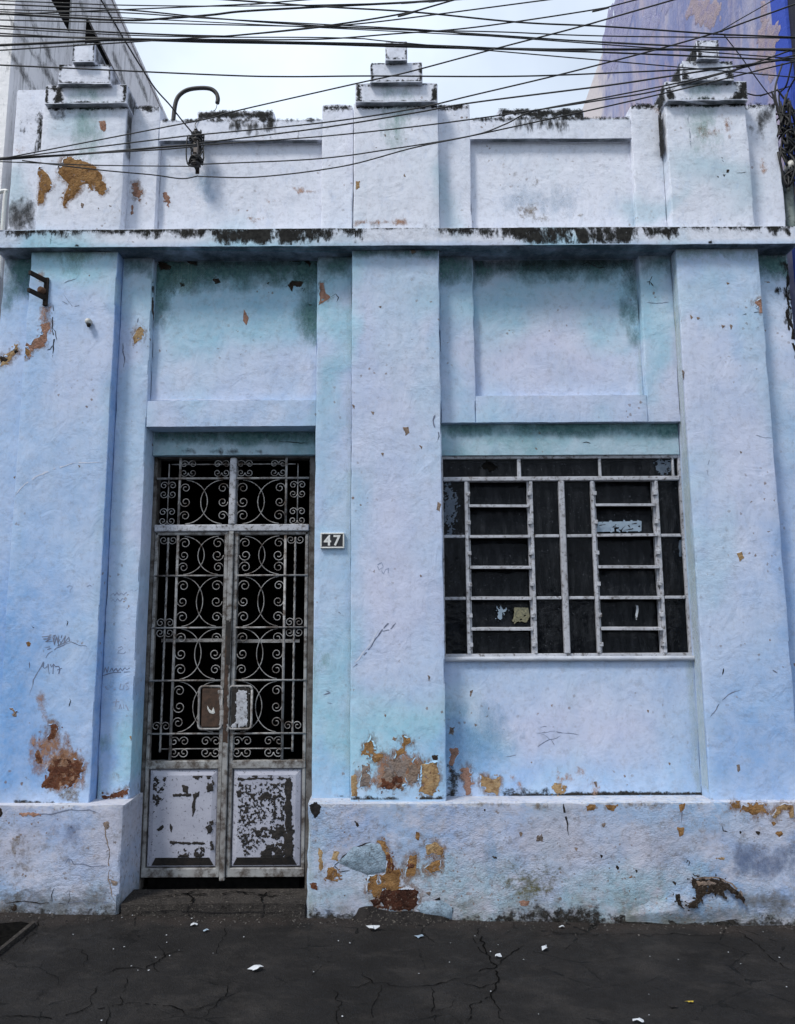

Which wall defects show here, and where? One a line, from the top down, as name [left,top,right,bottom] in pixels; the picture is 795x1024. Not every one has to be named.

water stain [9,25,467,158]
mould [475,40,775,158]
spalling [37,156,111,209]
water stain [0,198,793,337]
spalling [0,322,52,366]
spalling [34,720,85,791]
peeling [152,776,214,817]
peeling [236,775,295,857]
spalling [351,727,503,798]
spalling [729,800,795,837]
spalling [364,832,446,912]
spalling [673,874,745,911]